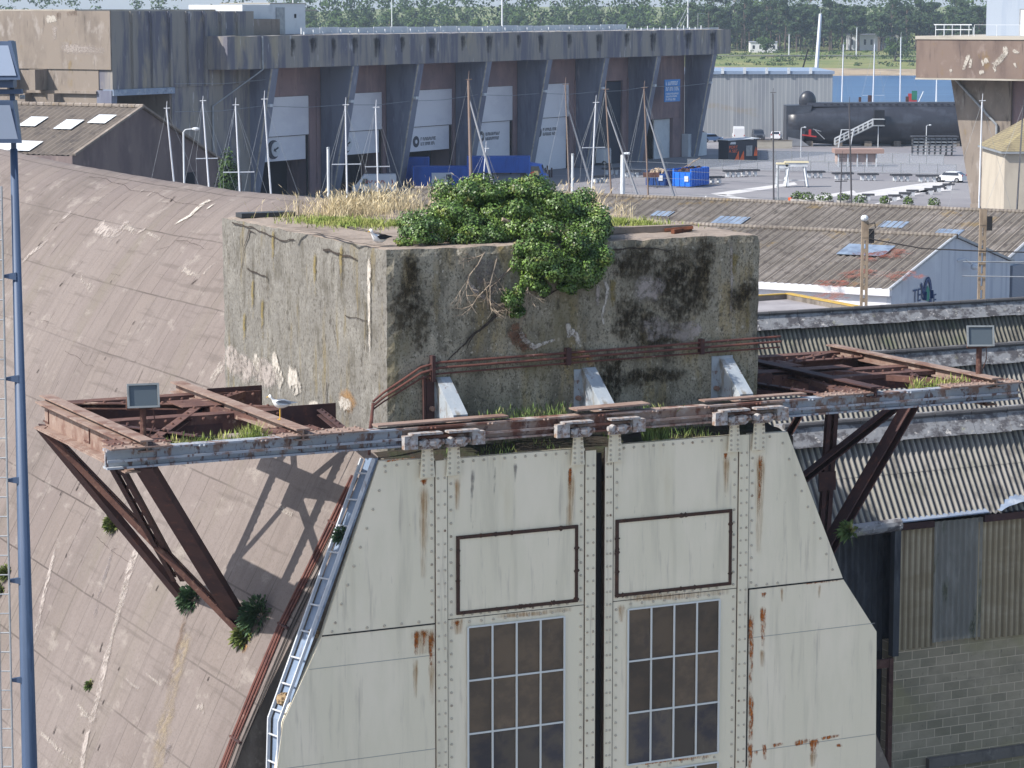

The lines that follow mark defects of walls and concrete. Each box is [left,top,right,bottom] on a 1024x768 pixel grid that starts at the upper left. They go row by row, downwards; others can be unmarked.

leakage [637,277,664,299]
efflorescence [566,323,580,344]
leakage [643,317,701,342]
corrosion [749,592,766,681]
corrosion [414,631,434,678]
corrosion [748,697,781,768]
corrosion [796,735,841,759]